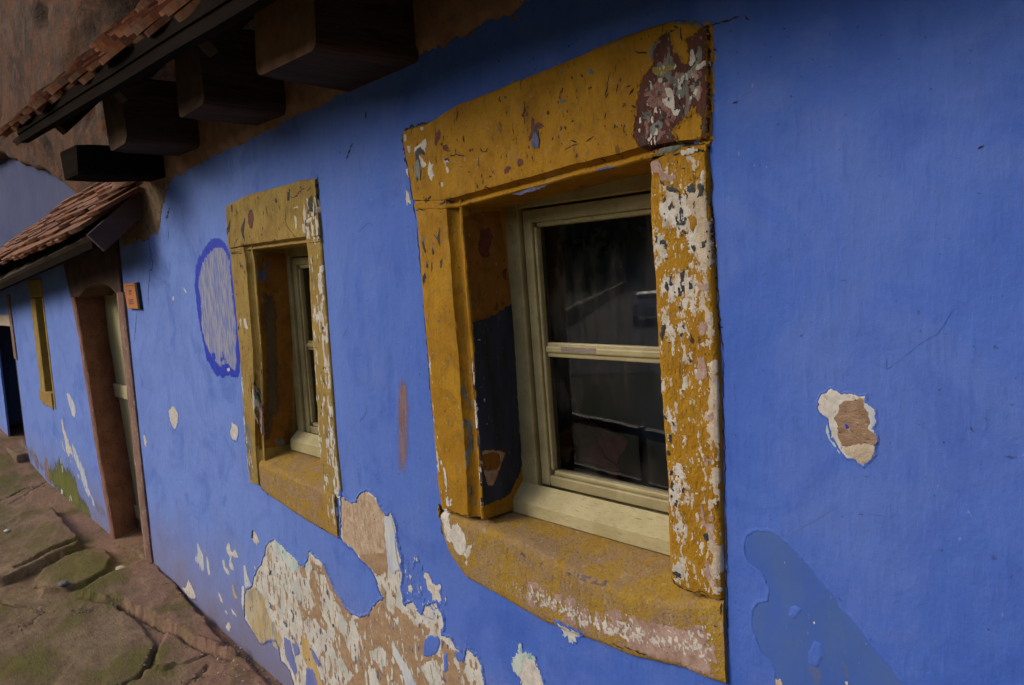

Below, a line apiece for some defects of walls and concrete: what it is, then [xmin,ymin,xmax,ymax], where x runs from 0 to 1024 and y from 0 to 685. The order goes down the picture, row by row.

spalling [404,112,467,205]
peeling [596,19,725,596]
peeling [60,309,114,535]
peeling [218,186,487,685]
spalling [815,386,881,469]
peeling [491,580,719,685]